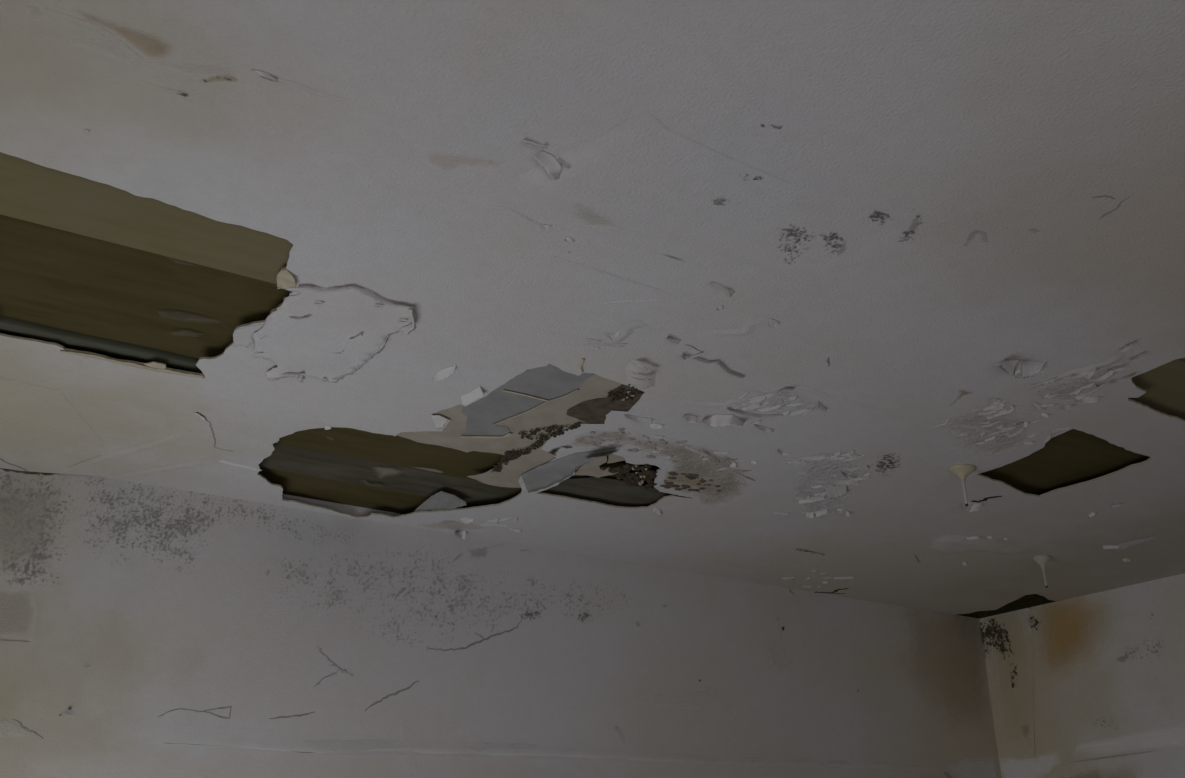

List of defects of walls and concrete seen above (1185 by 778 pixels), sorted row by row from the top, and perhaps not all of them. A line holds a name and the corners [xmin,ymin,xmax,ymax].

peeling [250,285,418,383]
spalling [397,359,761,503]
leakage [0,474,70,584]
leakage [85,477,327,568]
leakage [285,549,589,639]
leakage [917,601,1107,737]